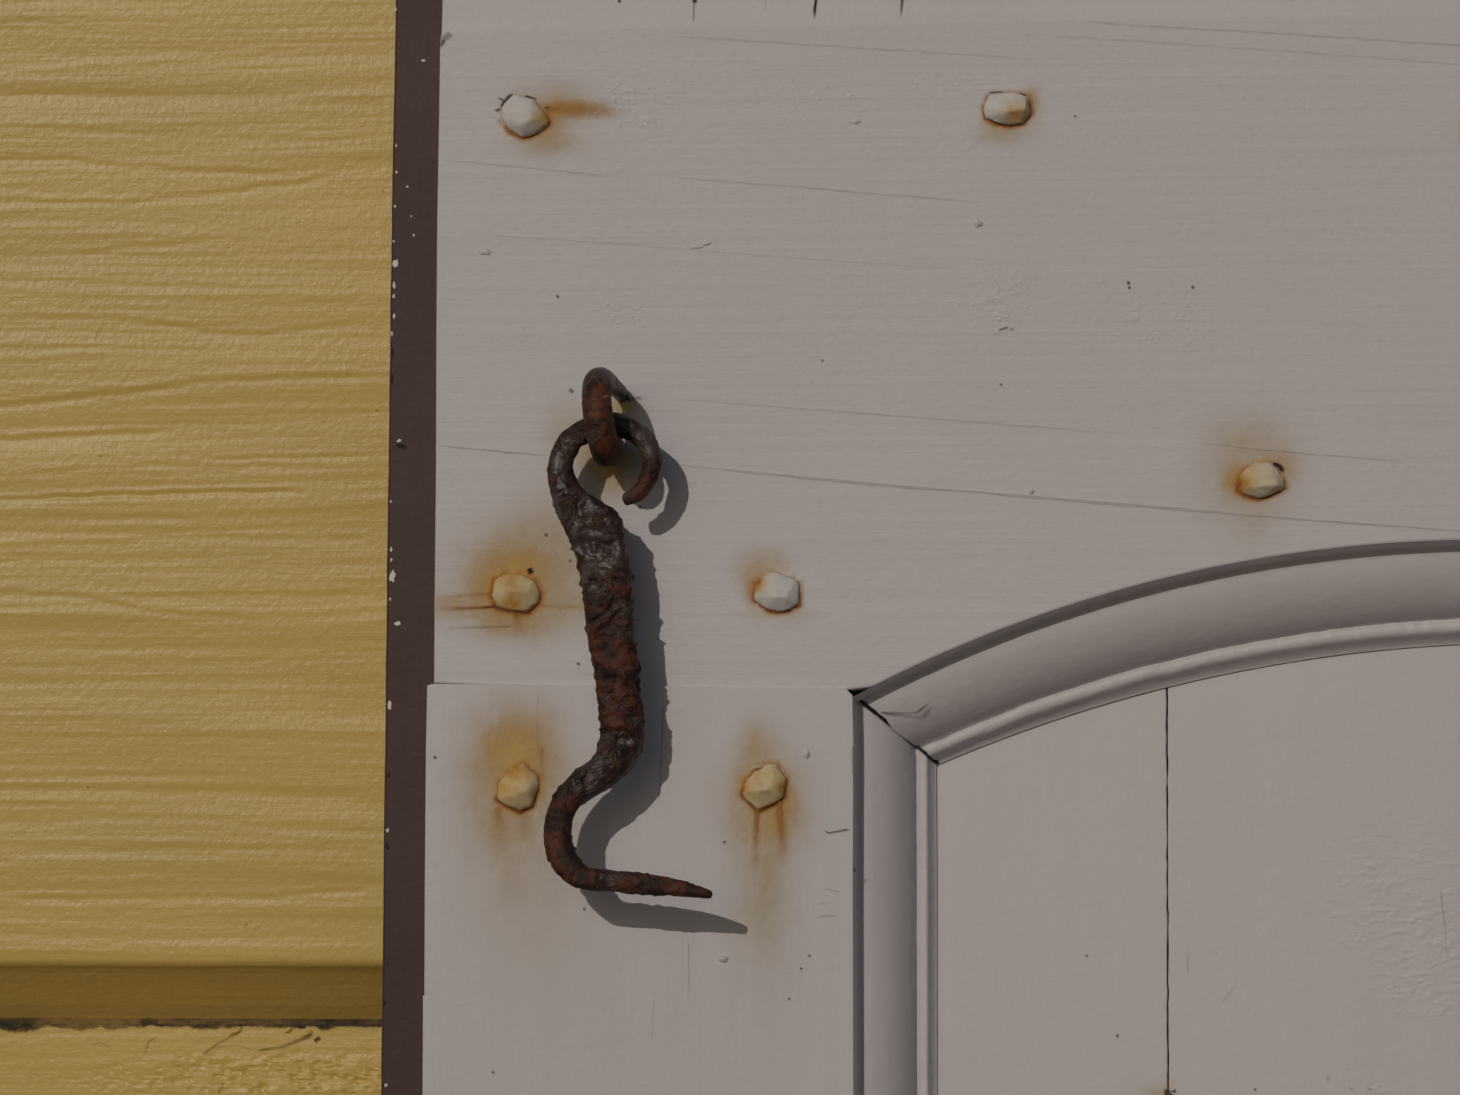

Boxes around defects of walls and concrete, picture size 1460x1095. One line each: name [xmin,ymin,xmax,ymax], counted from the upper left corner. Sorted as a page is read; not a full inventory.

corrosion [504,100,594,141]
corrosion [587,449,631,486]
corrosion [1226,459,1288,502]
corrosion [453,544,557,629]
corrosion [481,721,548,835]
corrosion [737,747,796,841]